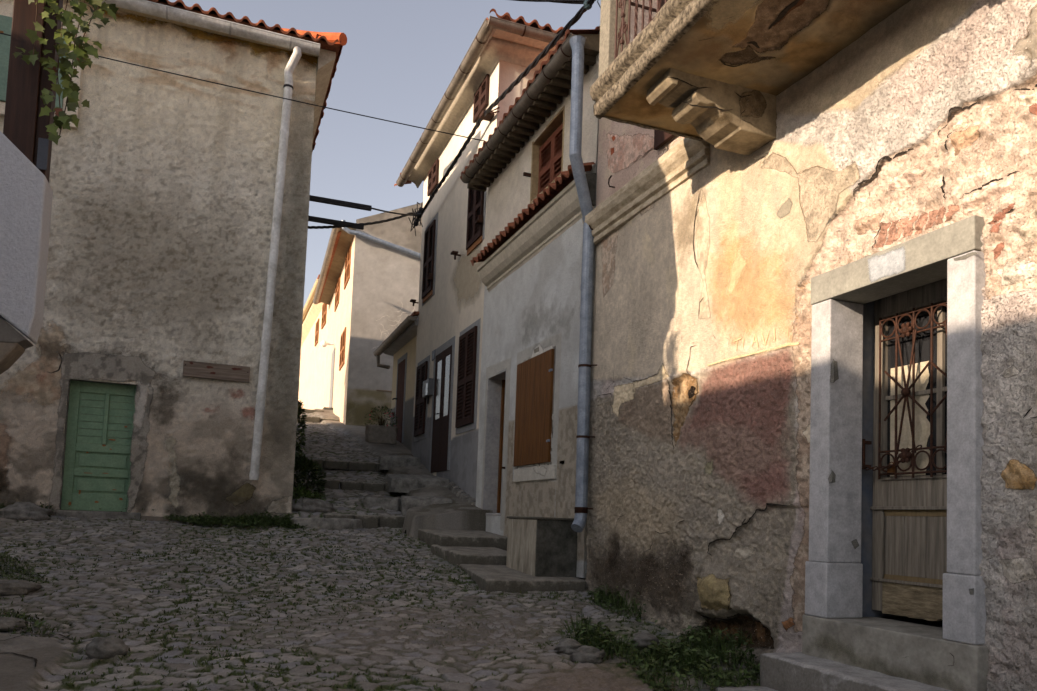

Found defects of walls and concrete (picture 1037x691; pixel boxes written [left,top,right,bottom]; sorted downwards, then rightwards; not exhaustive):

spalling [719,0,829,65]
crack [1012,4,1037,90]
flaking render [1014,6,1037,59]
crack [938,95,984,150]
crack [766,153,832,239]
crack [853,148,913,200]
crack [940,171,1020,199]
spalling [761,72,1037,632]
spalling [611,365,699,442]
crack [708,503,792,561]
crack [701,580,769,631]